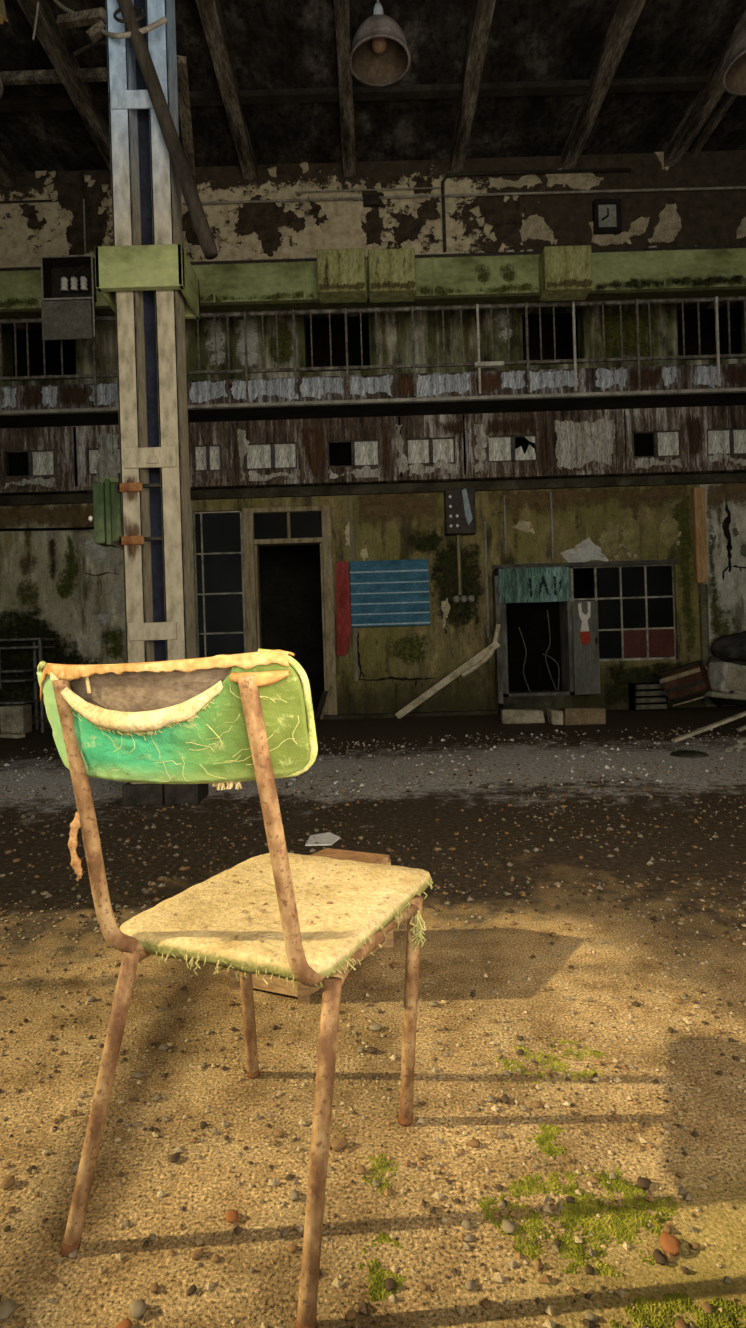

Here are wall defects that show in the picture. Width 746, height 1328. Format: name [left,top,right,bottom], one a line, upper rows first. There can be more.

peeling [16,170,109,255]
peeling [360,176,446,255]
peeling [469,168,603,252]
peeling [589,204,682,248]
peeling [736,217,746,239]
damp [359,492,484,633]
crack [722,502,746,580]
damp [0,503,124,715]